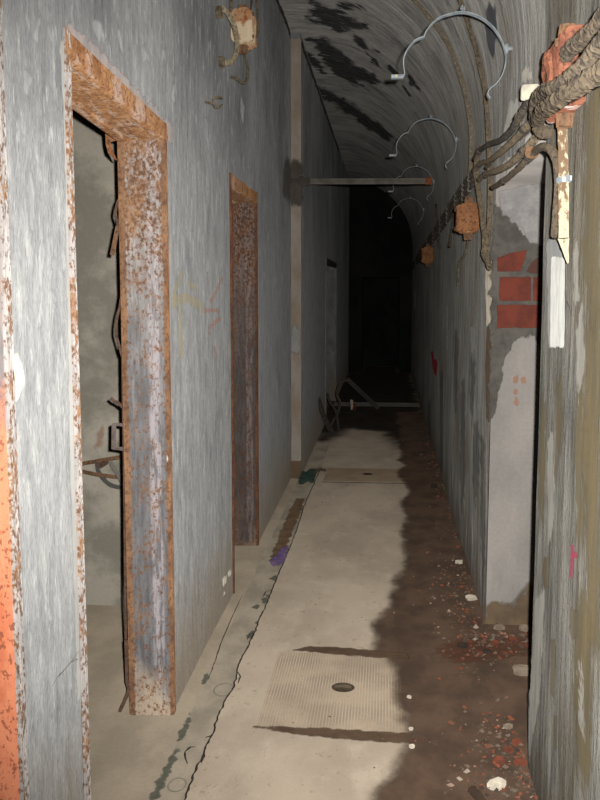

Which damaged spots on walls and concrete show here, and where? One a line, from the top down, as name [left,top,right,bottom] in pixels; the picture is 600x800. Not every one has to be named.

leakage [318,85,395,142]
leakage [304,0,421,97]
flaking render [485,205,565,421]
crack [184,471,320,800]